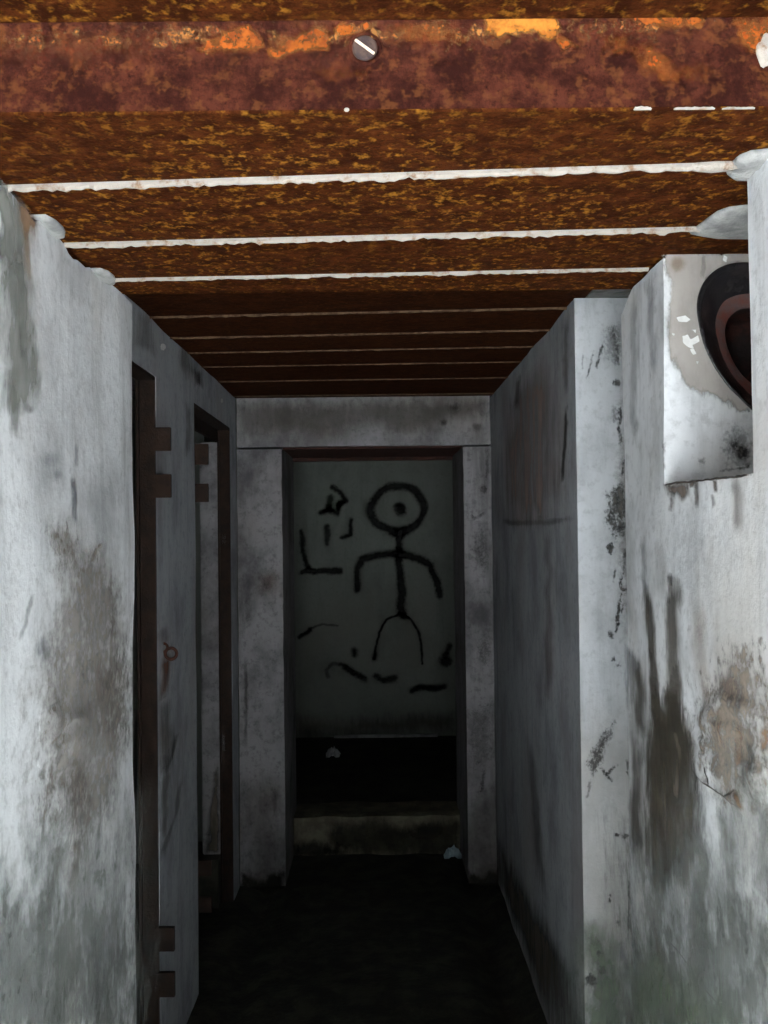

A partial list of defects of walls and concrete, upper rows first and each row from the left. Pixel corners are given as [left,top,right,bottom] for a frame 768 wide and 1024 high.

rust [1,29,132,60]
rust [152,17,705,81]
rust [737,18,768,50]
rust [20,206,36,237]
peeling [672,315,699,364]
leakage [604,462,627,639]
leakage [588,578,768,1024]